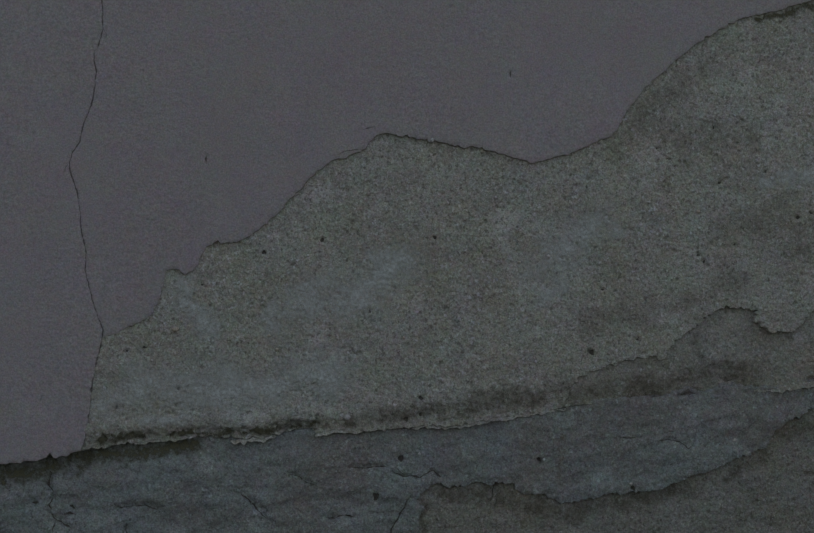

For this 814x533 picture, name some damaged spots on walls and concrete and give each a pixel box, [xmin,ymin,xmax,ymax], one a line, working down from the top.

crack [64,0,106,446]
spalling [78,1,814,452]
spalling [417,408,814,533]